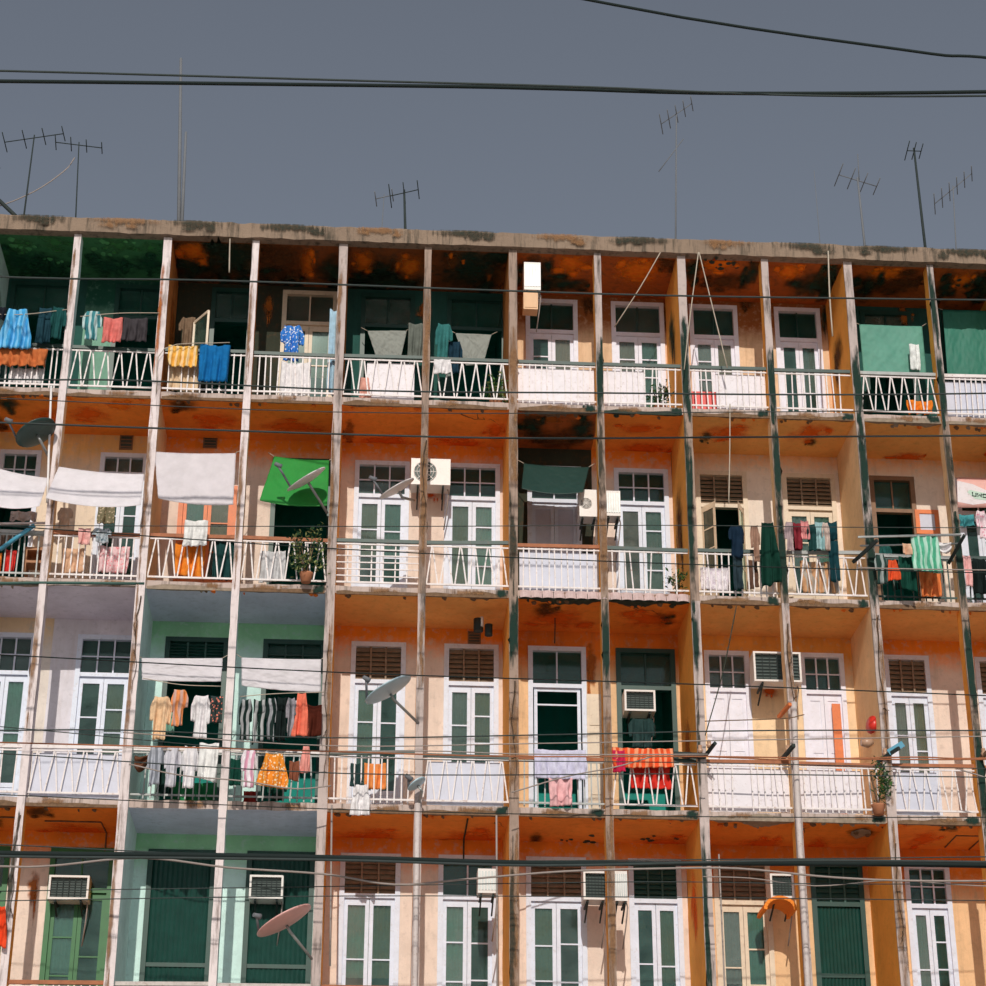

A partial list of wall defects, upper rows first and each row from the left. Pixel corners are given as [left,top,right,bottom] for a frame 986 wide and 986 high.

water stain [658,259,675,273]
water stain [686,258,759,292]
water stain [781,242,842,335]
water stain [938,248,986,259]
water stain [0,399,18,431]
water stain [509,328,605,495]
water stain [853,266,986,606]
water stain [843,349,891,783]
water stain [964,622,978,710]
water stain [941,729,986,831]
water stain [894,867,910,979]